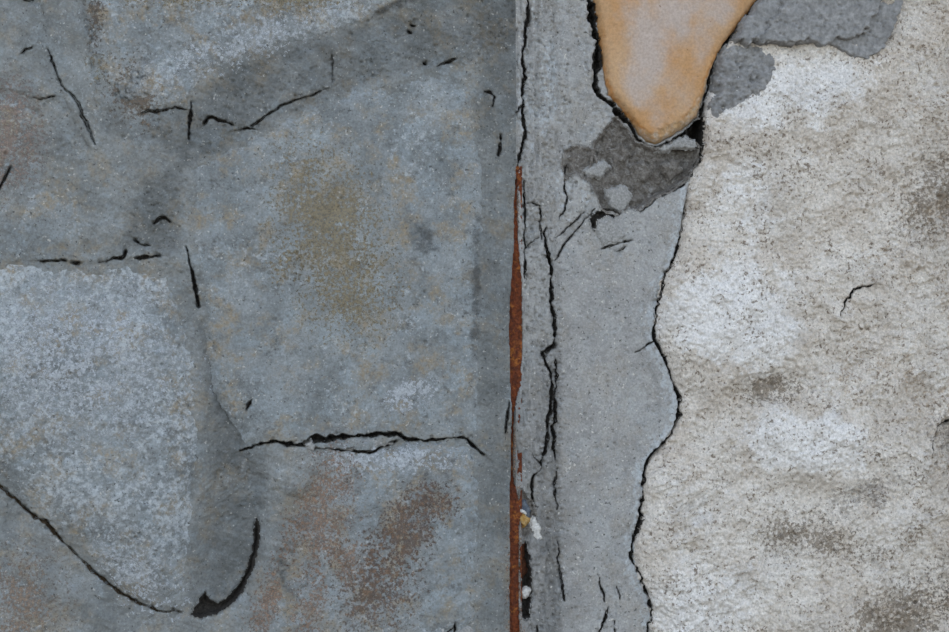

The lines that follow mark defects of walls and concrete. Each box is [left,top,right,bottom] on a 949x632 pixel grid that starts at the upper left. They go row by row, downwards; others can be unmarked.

peeling [729,0,903,60]
crack [23,47,95,143]
crack [142,89,324,136]
spalling [561,116,702,246]
crack [186,247,200,306]
crack [498,0,595,526]
crack [586,0,748,632]
crack [840,284,873,316]
crack [240,431,485,455]
crack [0,484,181,613]
crack [557,541,565,601]